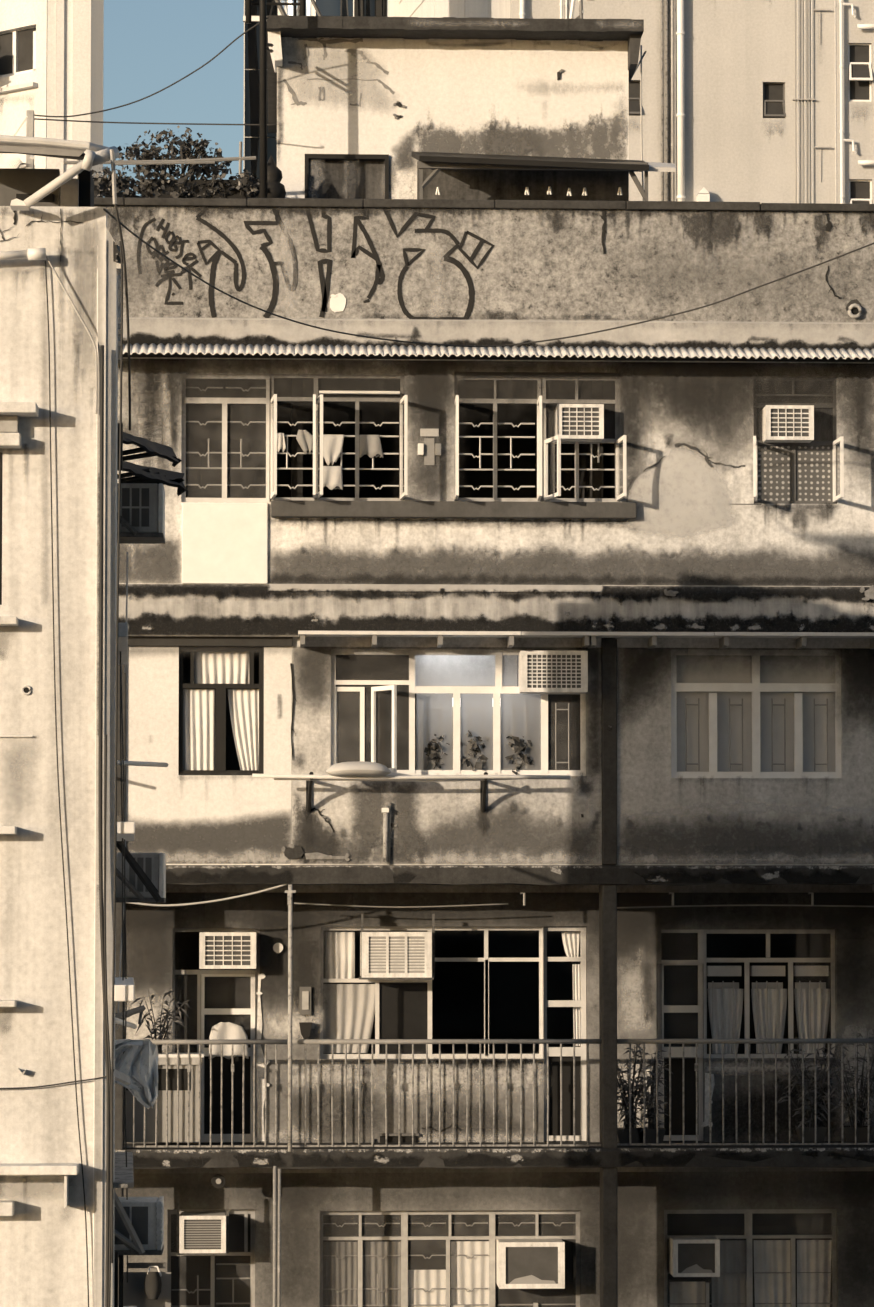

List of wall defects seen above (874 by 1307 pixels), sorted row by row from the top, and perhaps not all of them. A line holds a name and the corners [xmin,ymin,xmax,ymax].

leakage [383,114,627,190]
leakage [524,209,563,232]
leakage [580,210,650,231]
leakage [668,211,785,251]
leakage [814,215,829,249]
leakage [123,363,175,441]
crack [644,443,745,471]
leakage [374,519,622,528]
leakage [118,542,874,635]
leakage [620,816,874,878]